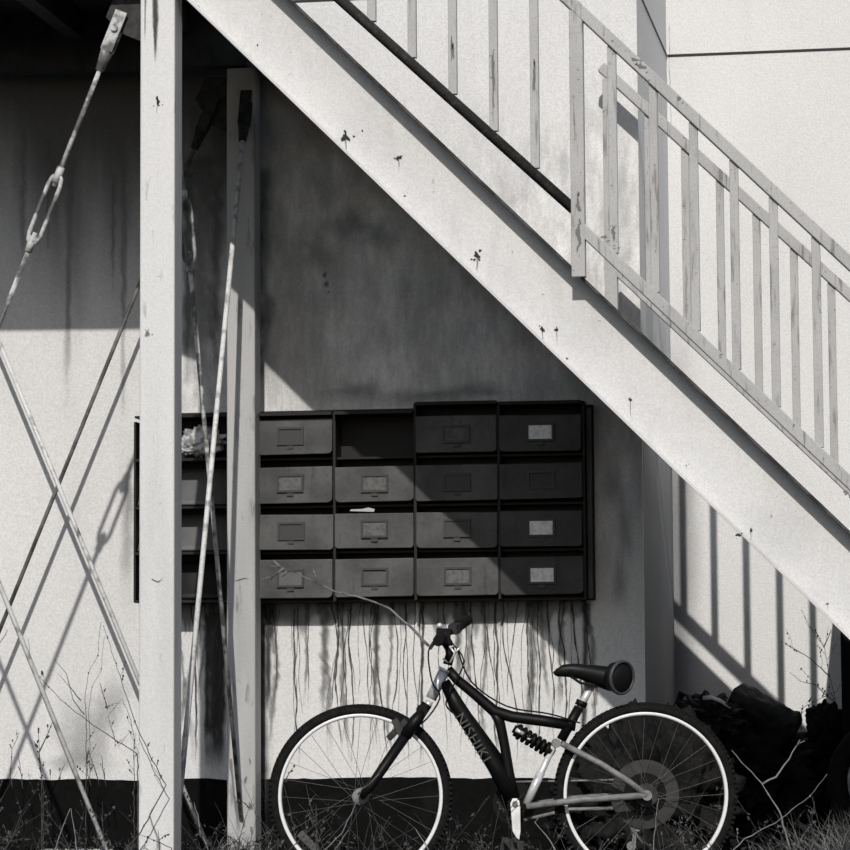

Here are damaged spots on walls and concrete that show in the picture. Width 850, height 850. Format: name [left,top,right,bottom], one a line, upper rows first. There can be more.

damp [194,606,226,752]
damp [291,606,309,732]
damp [326,604,425,717]
damp [463,601,591,718]
damp [580,679,596,725]